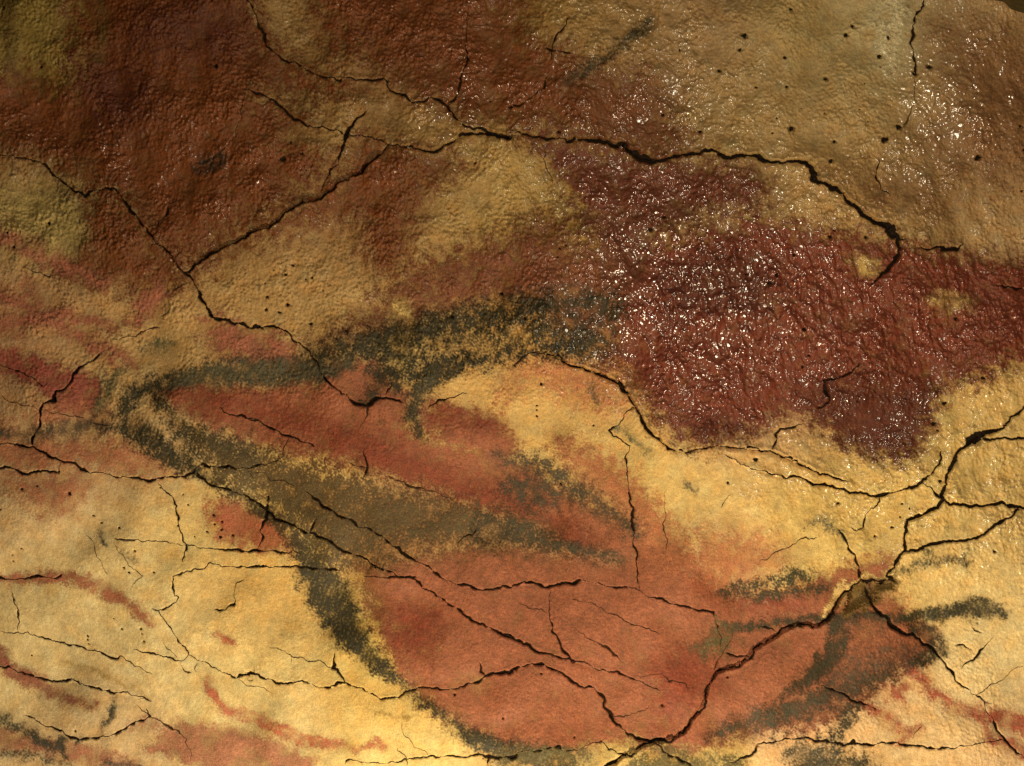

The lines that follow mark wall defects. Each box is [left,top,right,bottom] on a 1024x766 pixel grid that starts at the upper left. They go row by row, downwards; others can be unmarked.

crack [0,0,980,478]
crack [0,310,1024,766]